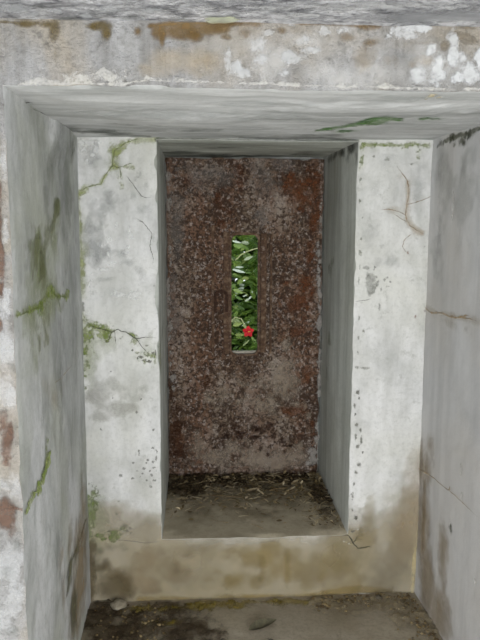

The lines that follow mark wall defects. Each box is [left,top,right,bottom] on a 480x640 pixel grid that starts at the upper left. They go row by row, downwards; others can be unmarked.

crack [425,307,471,319]
rust [168,406,187,456]
damp [67,503,442,629]